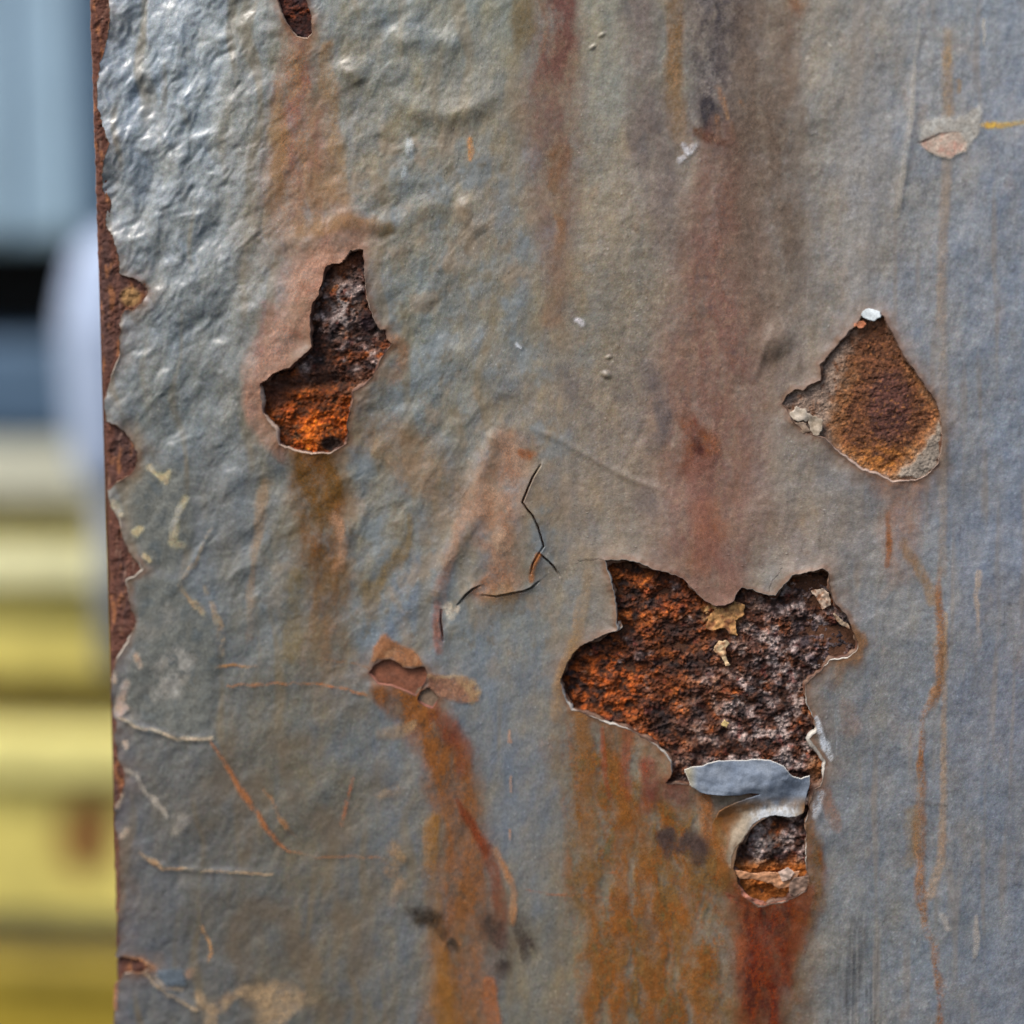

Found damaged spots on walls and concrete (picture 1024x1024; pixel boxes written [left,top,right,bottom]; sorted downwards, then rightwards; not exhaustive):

peeling [277,0,313,39]
peeling [918,107,981,158]
peeling [259,248,393,455]
peeling [782,308,943,483]
rust [59,0,151,1024]
crack [464,468,559,598]
peeling [368,634,480,708]
peeling [560,559,859,907]
rust [372,687,509,1024]
rust [568,712,823,1024]